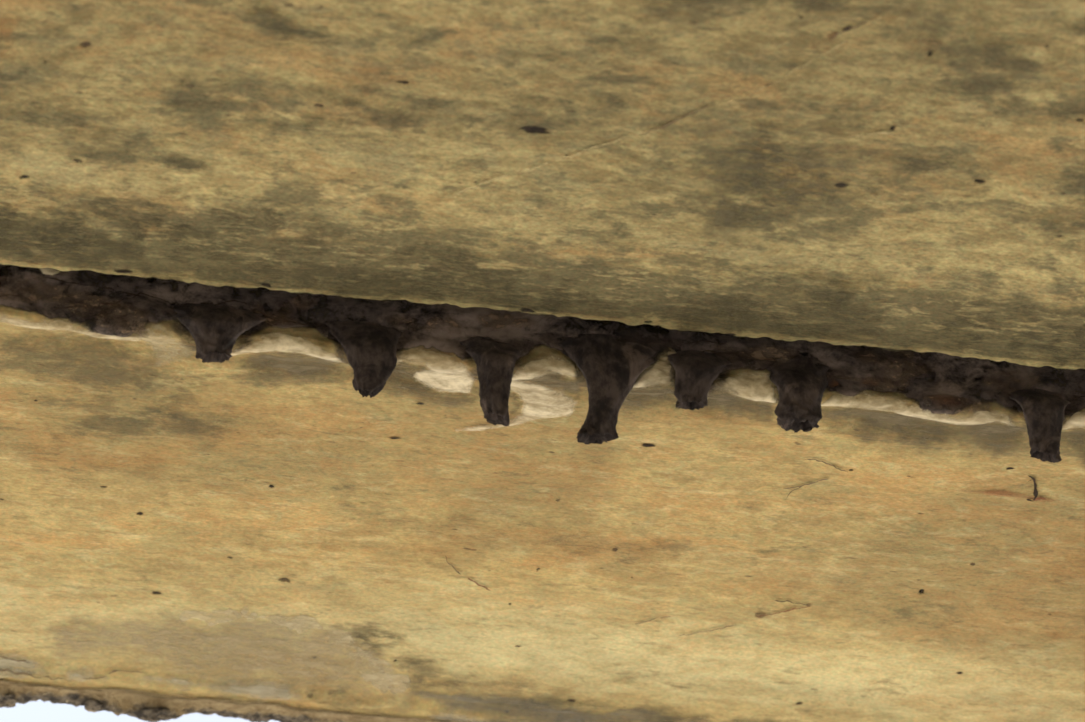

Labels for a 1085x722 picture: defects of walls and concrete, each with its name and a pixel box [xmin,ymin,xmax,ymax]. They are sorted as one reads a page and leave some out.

water stain [0,280,196,357]
water stain [231,314,350,375]
water stain [388,317,478,405]
water stain [479,313,587,426]
water stain [616,337,681,409]
water stain [707,347,791,414]
water stain [821,369,1027,449]
water stain [1062,399,1085,443]